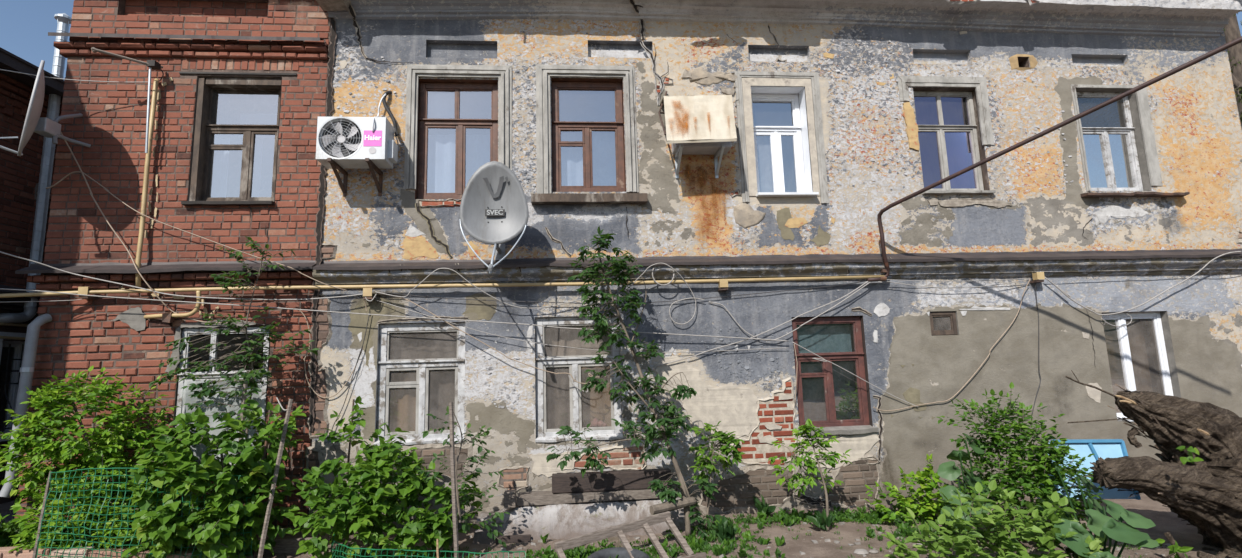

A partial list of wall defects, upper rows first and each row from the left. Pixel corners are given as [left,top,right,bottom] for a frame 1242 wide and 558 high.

spalling [320,242,337,261]
peeling [403,224,439,259]
peeling [785,215,835,246]